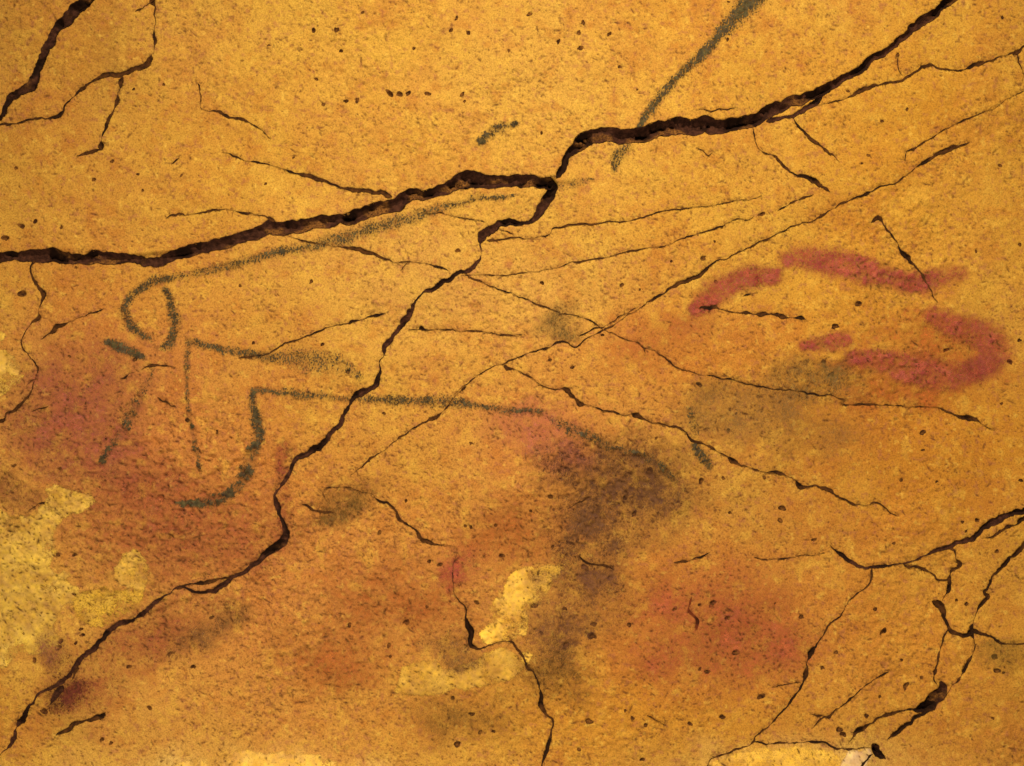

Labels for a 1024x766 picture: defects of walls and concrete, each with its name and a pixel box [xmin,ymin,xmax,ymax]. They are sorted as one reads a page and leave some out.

crack [0,0,1024,423]
crack [0,143,995,766]
crack [707,509,1024,766]